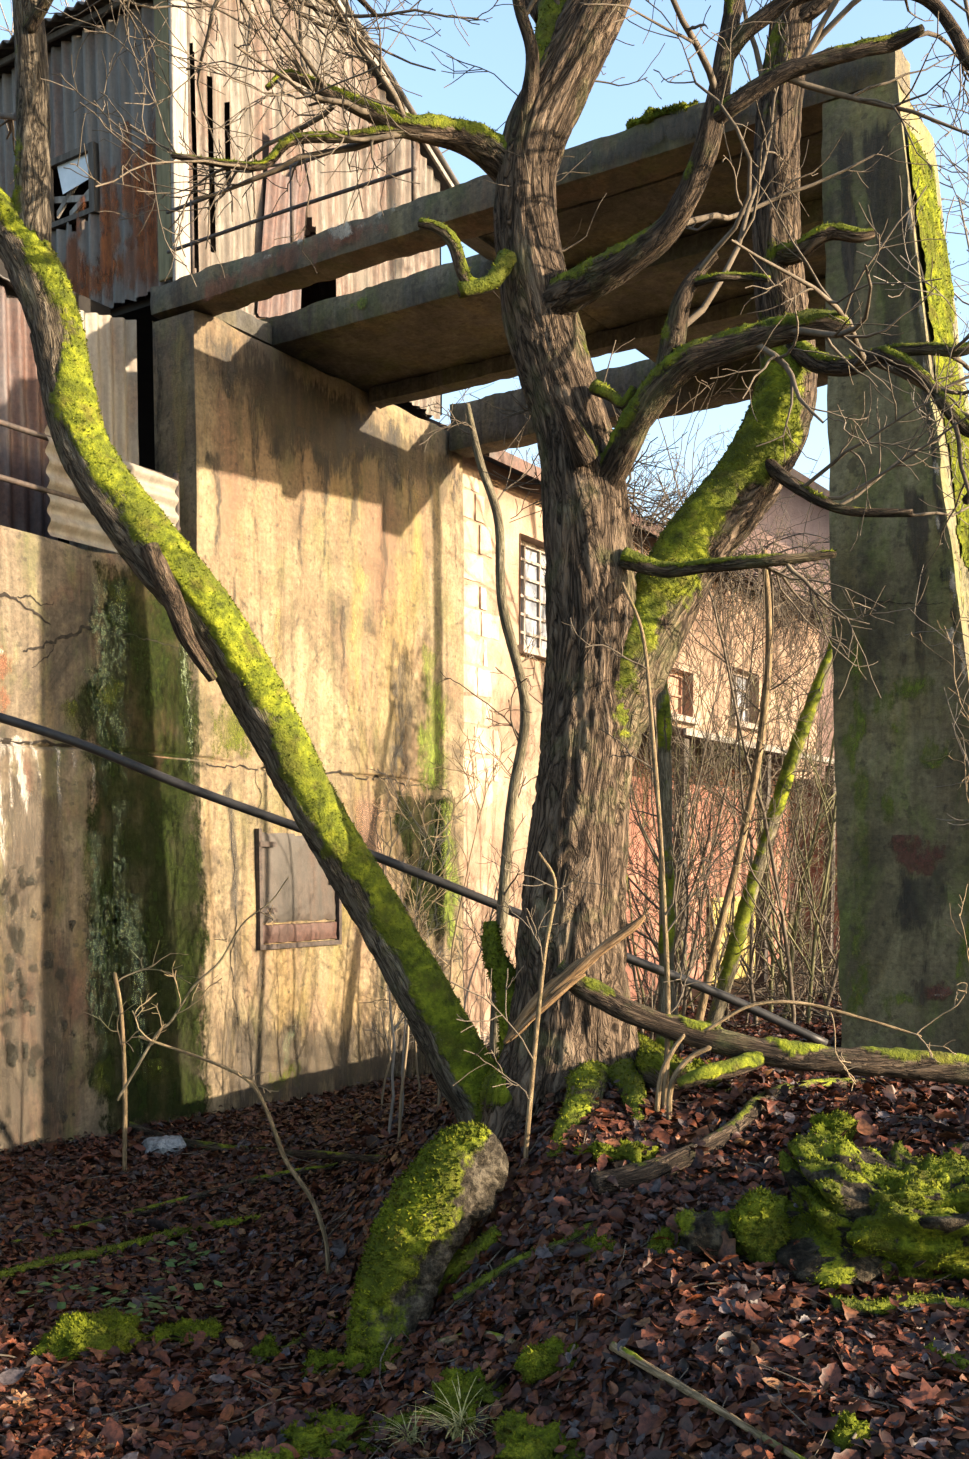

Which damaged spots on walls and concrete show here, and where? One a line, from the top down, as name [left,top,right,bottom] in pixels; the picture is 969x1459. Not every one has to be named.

rust [62,118,159,300]
water stain [837,120,927,371]
crack [0,592,185,668]
water stain [207,340,460,569]
water stain [902,390,966,683]
water stain [0,735,36,859]
water stain [55,549,431,1137]
water stain [890,835,947,934]